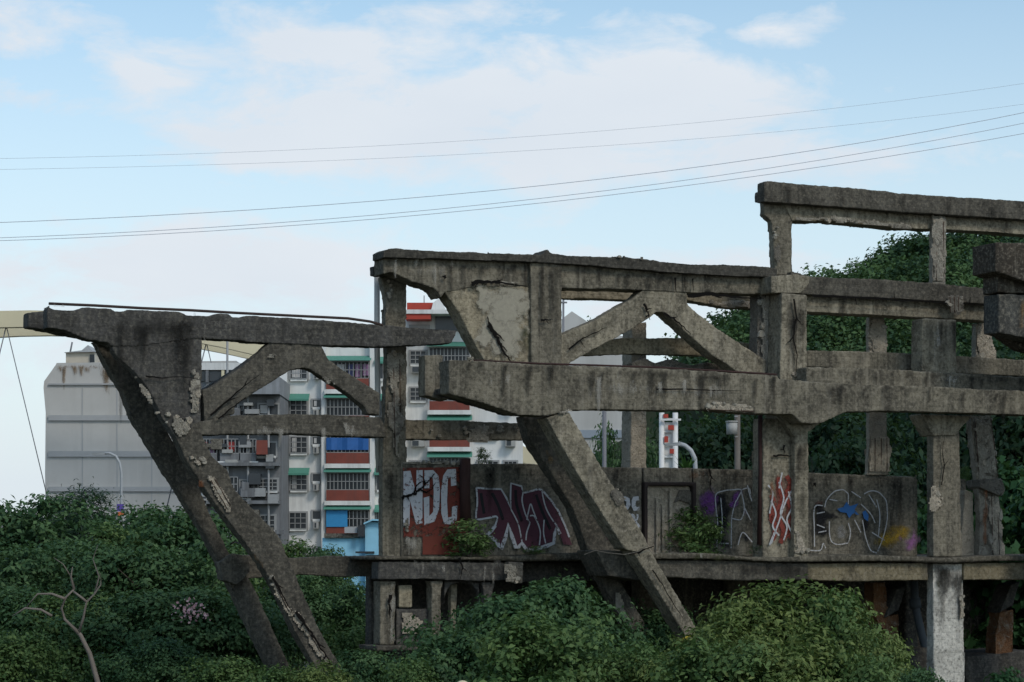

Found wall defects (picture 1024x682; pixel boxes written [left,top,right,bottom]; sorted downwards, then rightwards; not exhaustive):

crack [487,316,511,361]
crack [787,294,984,375]
spalling [134,369,201,437]
spalling [189,456,231,512]
spalling [928,486,943,511]
crack [629,546,683,618]
spalling [269,575,332,672]